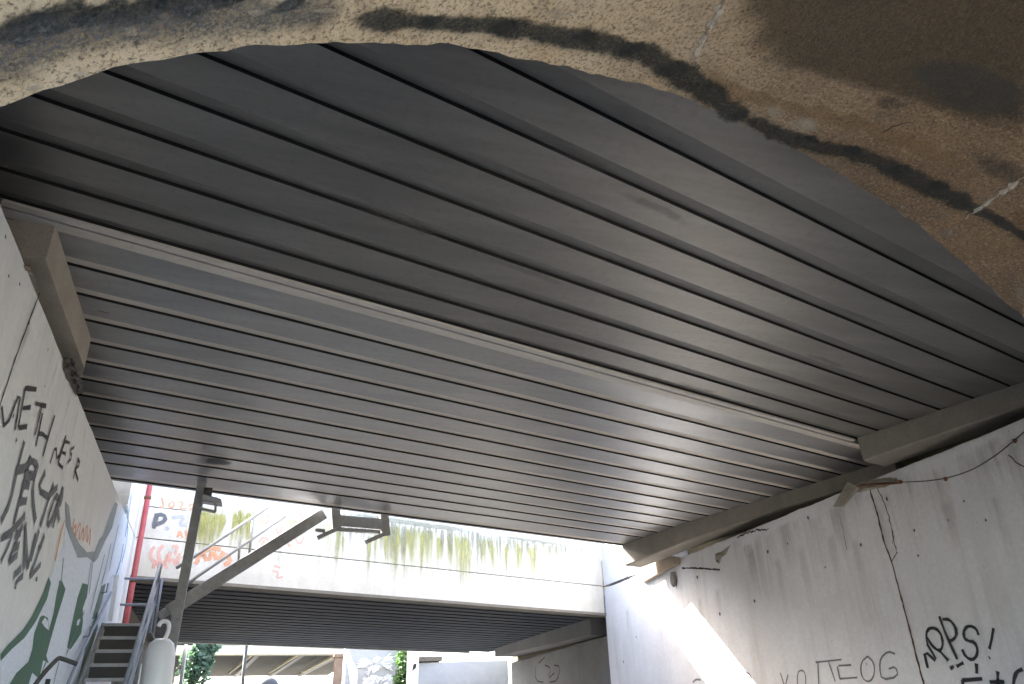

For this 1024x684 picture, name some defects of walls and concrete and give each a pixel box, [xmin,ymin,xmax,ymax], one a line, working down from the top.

damp [753,0,1024,116]
damp [974,161,1018,212]
damp [337,514,582,561]
crack [870,488,925,684]